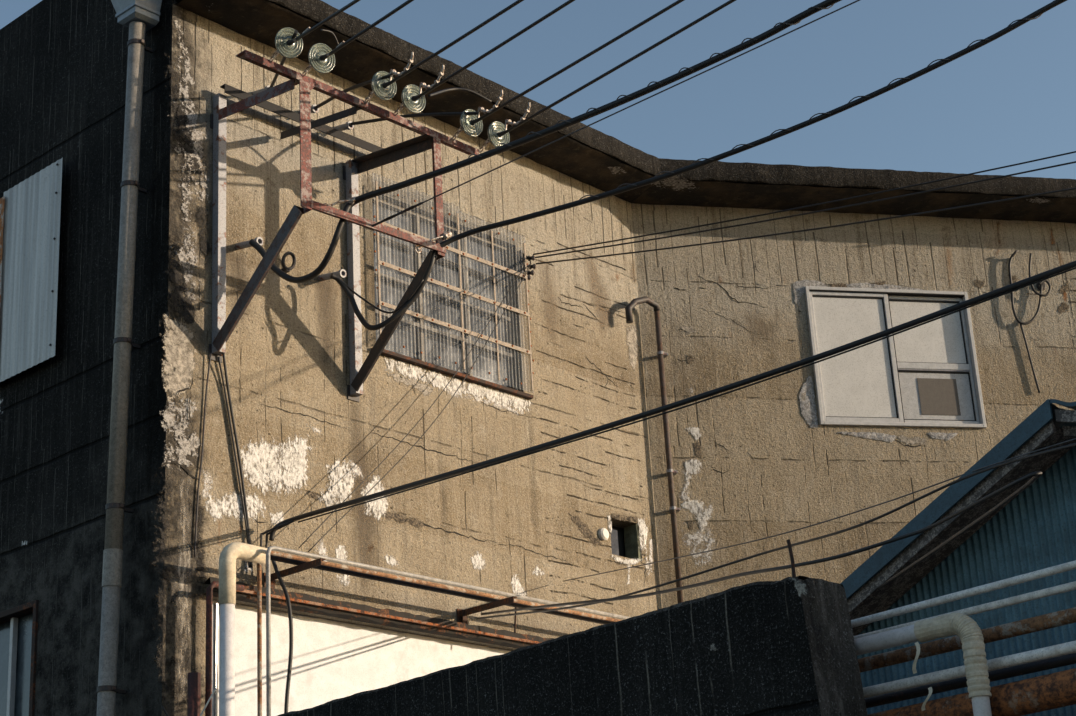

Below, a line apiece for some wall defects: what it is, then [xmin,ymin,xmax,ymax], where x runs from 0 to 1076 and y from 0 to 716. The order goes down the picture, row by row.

spalling [152,16,320,716]
peeling [385,357,531,414]
peeling [320,459,388,520]
peeling [681,427,715,565]
spalling [568,513,653,584]